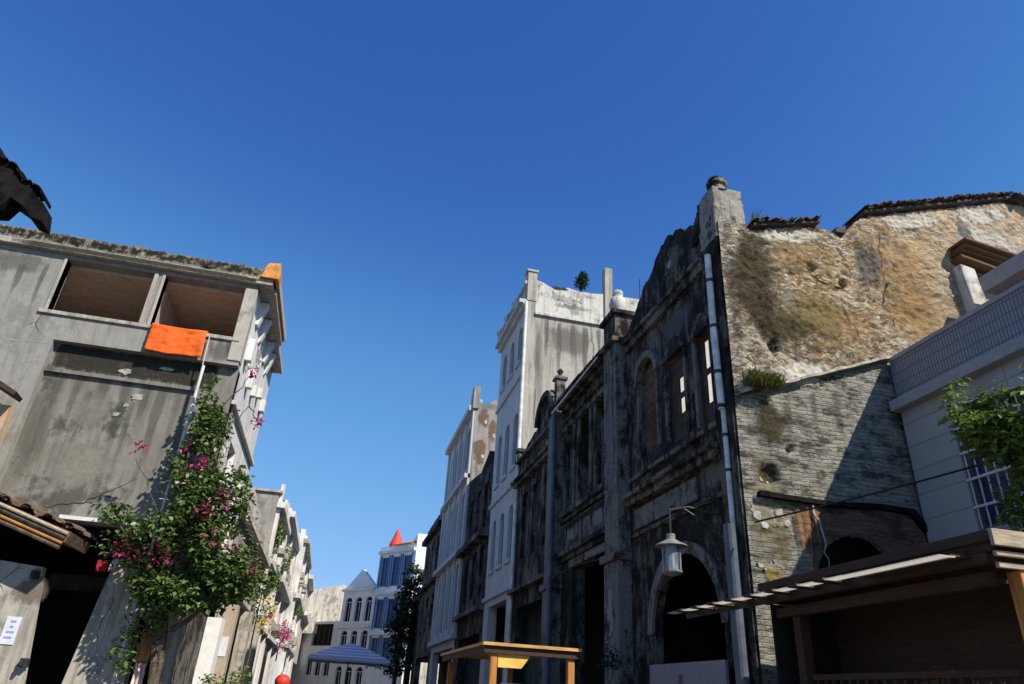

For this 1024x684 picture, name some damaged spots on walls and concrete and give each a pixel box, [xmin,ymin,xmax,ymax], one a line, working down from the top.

water stain [53,340,230,389]
water stain [545,320,601,367]
spalling [474,409,496,464]
crack [45,480,132,508]
spalling [757,461,781,484]
spalling [751,494,791,529]